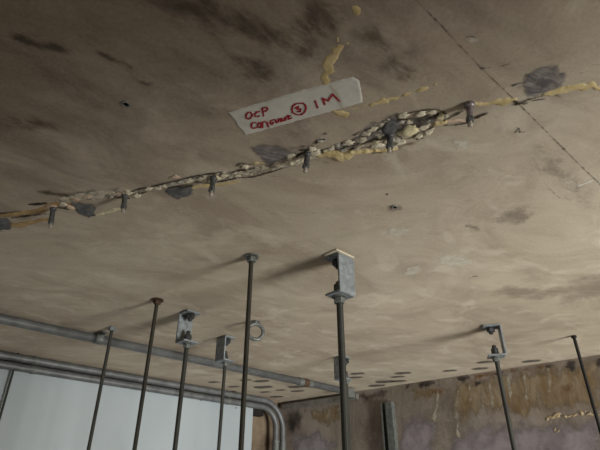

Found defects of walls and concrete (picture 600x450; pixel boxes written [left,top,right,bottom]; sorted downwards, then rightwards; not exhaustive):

crack [514,95,557,106]
crack [0,109,488,228]